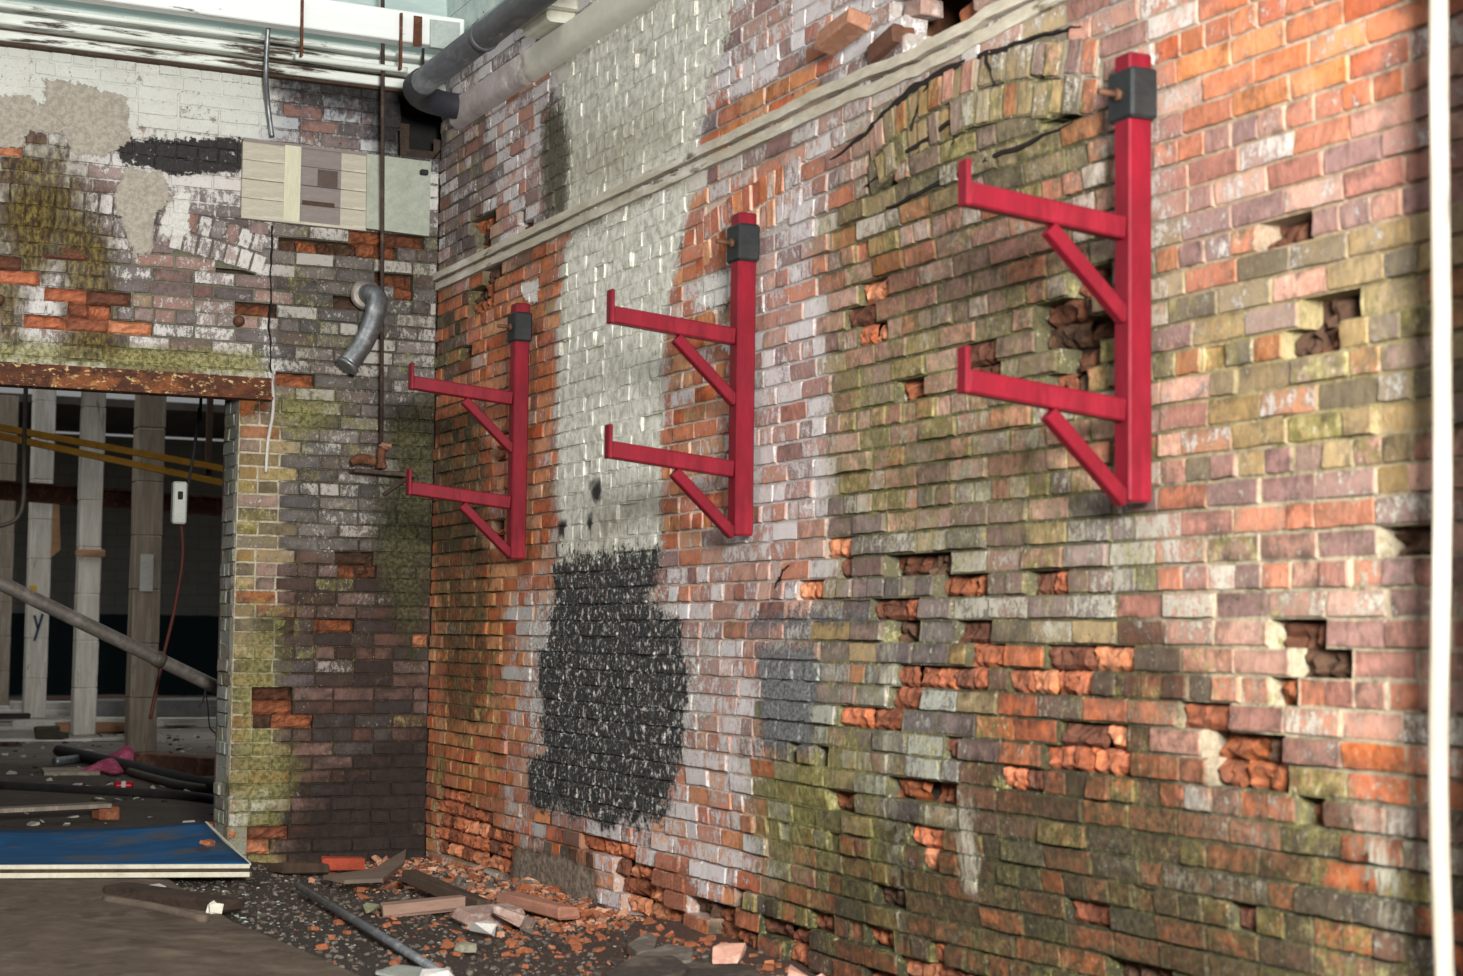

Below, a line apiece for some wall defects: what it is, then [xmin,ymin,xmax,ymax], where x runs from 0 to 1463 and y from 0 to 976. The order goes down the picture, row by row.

spalling [927,0,973,37]
crack [829,26,1081,209]
water stain [0,189,111,342]
peeling [520,0,835,966]
water stain [877,636,898,708]
spalling [841,620,1135,731]
spalling [1281,619,1353,706]
water stain [295,739,427,862]
water stain [956,799,980,899]
spalling [1004,720,1132,792]
spalling [1185,701,1290,792]
water stain [1346,803,1417,936]